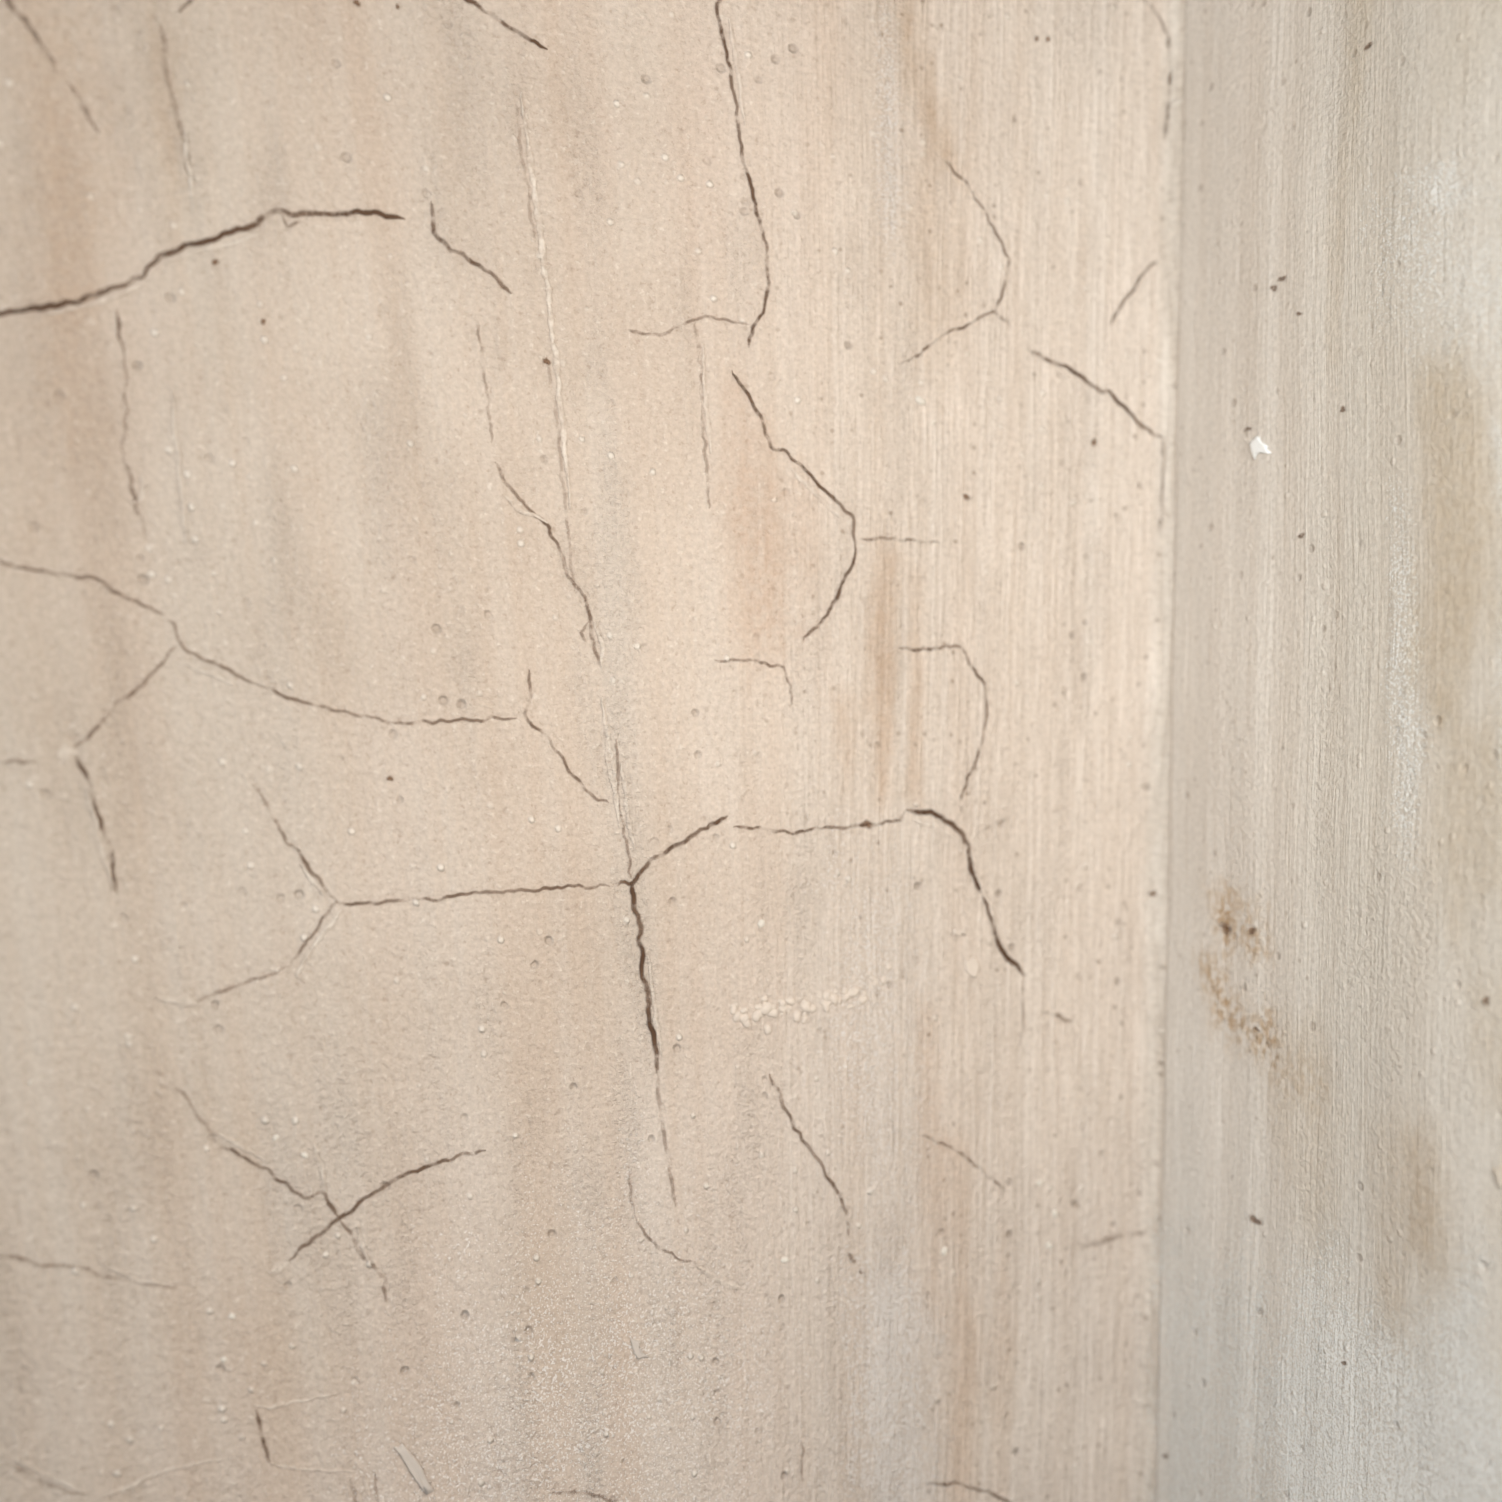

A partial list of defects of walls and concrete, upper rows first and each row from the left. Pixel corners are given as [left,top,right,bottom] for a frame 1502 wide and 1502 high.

crack [465,0,548,50]
crack [0,129,511,316]
crack [687,0,857,637]
crack [916,224,1008,357]
crack [1112,262,1157,321]
crack [1036,353,1164,524]
crack [503,495,605,668]
crack [182,661,308,704]
crack [6,726,117,892]
crack [282,645,1024,1071]
crack [217,1132,481,1292]
crack [770,1076,843,1203]